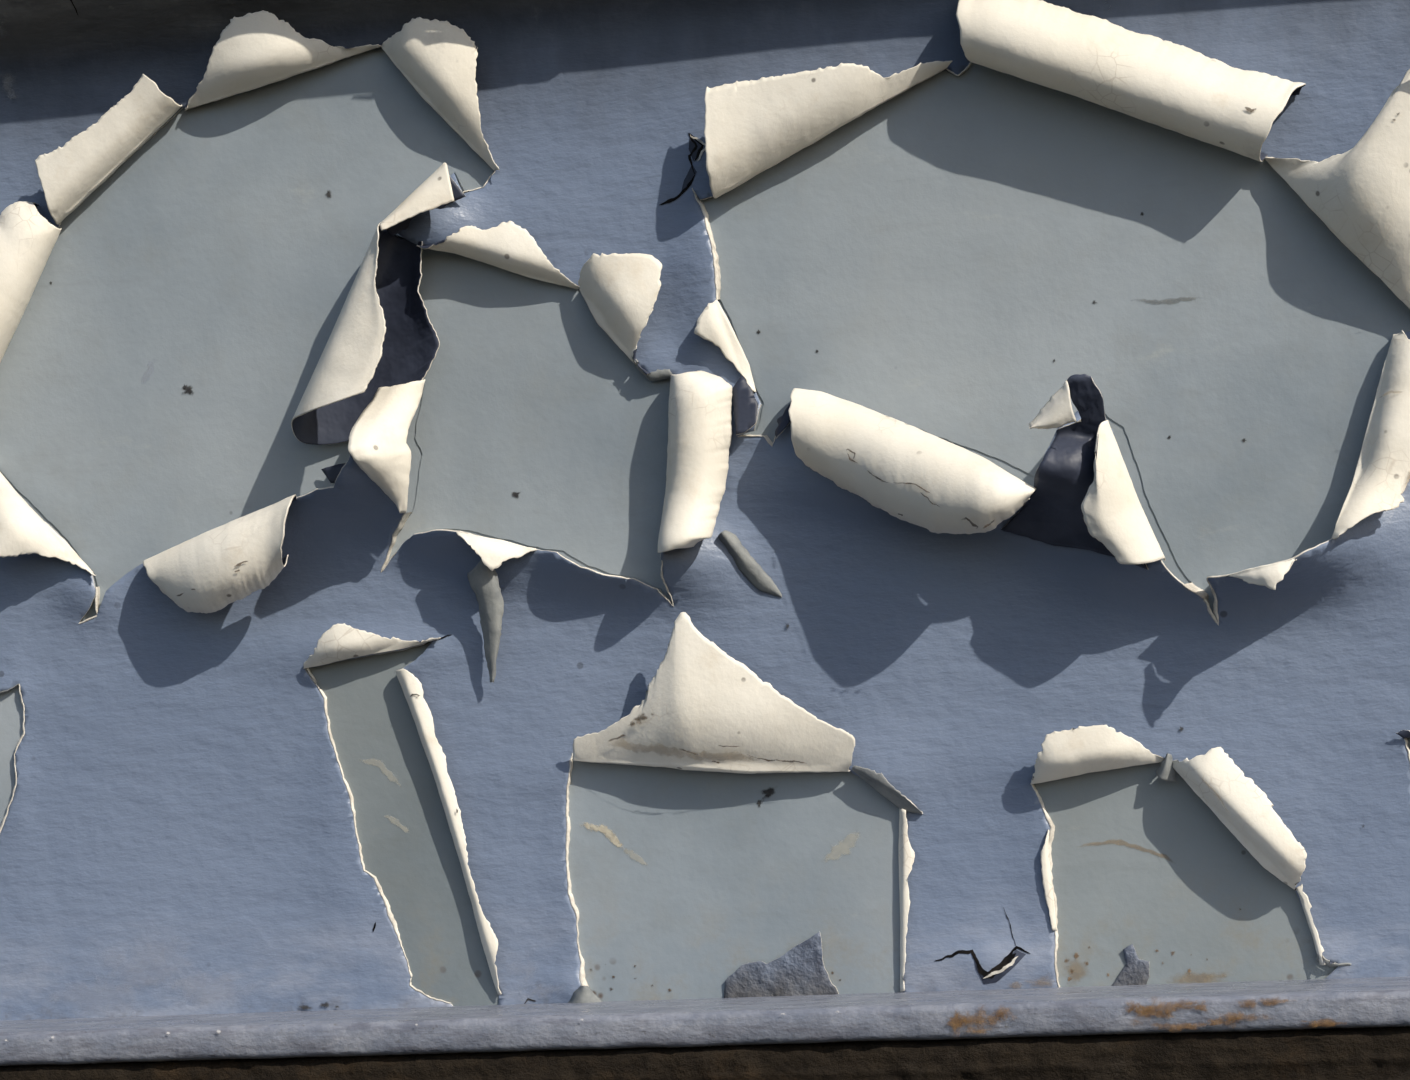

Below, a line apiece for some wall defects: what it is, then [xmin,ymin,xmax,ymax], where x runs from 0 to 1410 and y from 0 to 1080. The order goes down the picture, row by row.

peeling [0,0,1410,683]
peeling [0,683,25,832]
peeling [304,623,502,1006]
corrosion [0,999,1410,1080]
peeling [566,612,923,1003]
crack [935,909,1030,984]
peeling [1030,725,1351,987]
peeling [1396,730,1410,761]